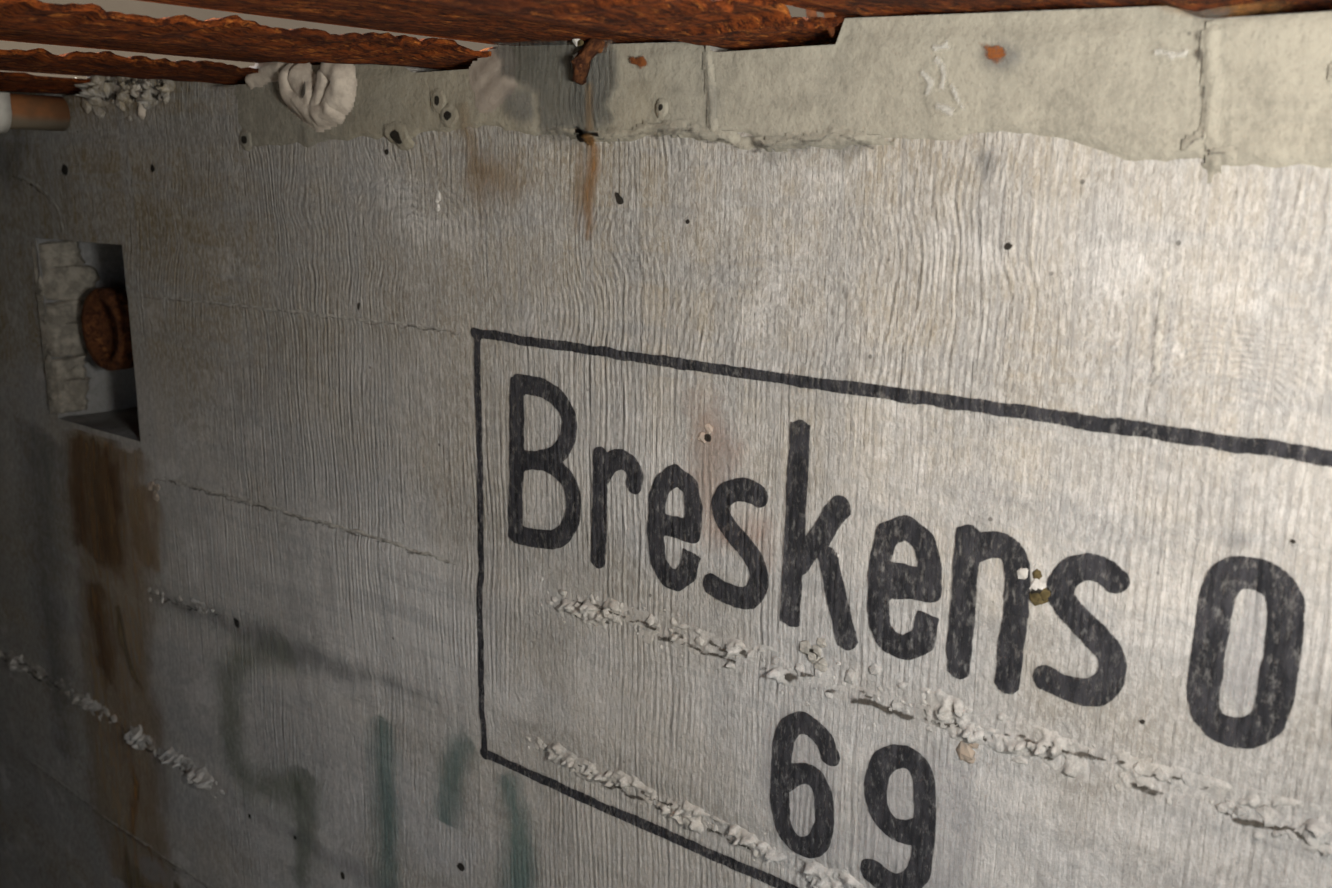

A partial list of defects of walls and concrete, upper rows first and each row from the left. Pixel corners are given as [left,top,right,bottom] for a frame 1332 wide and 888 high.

corrosion [806,9,835,36]
corrosion [630,56,647,69]
corrosion [985,46,1006,62]
water stain [498,40,615,128]
corrosion [585,121,596,223]